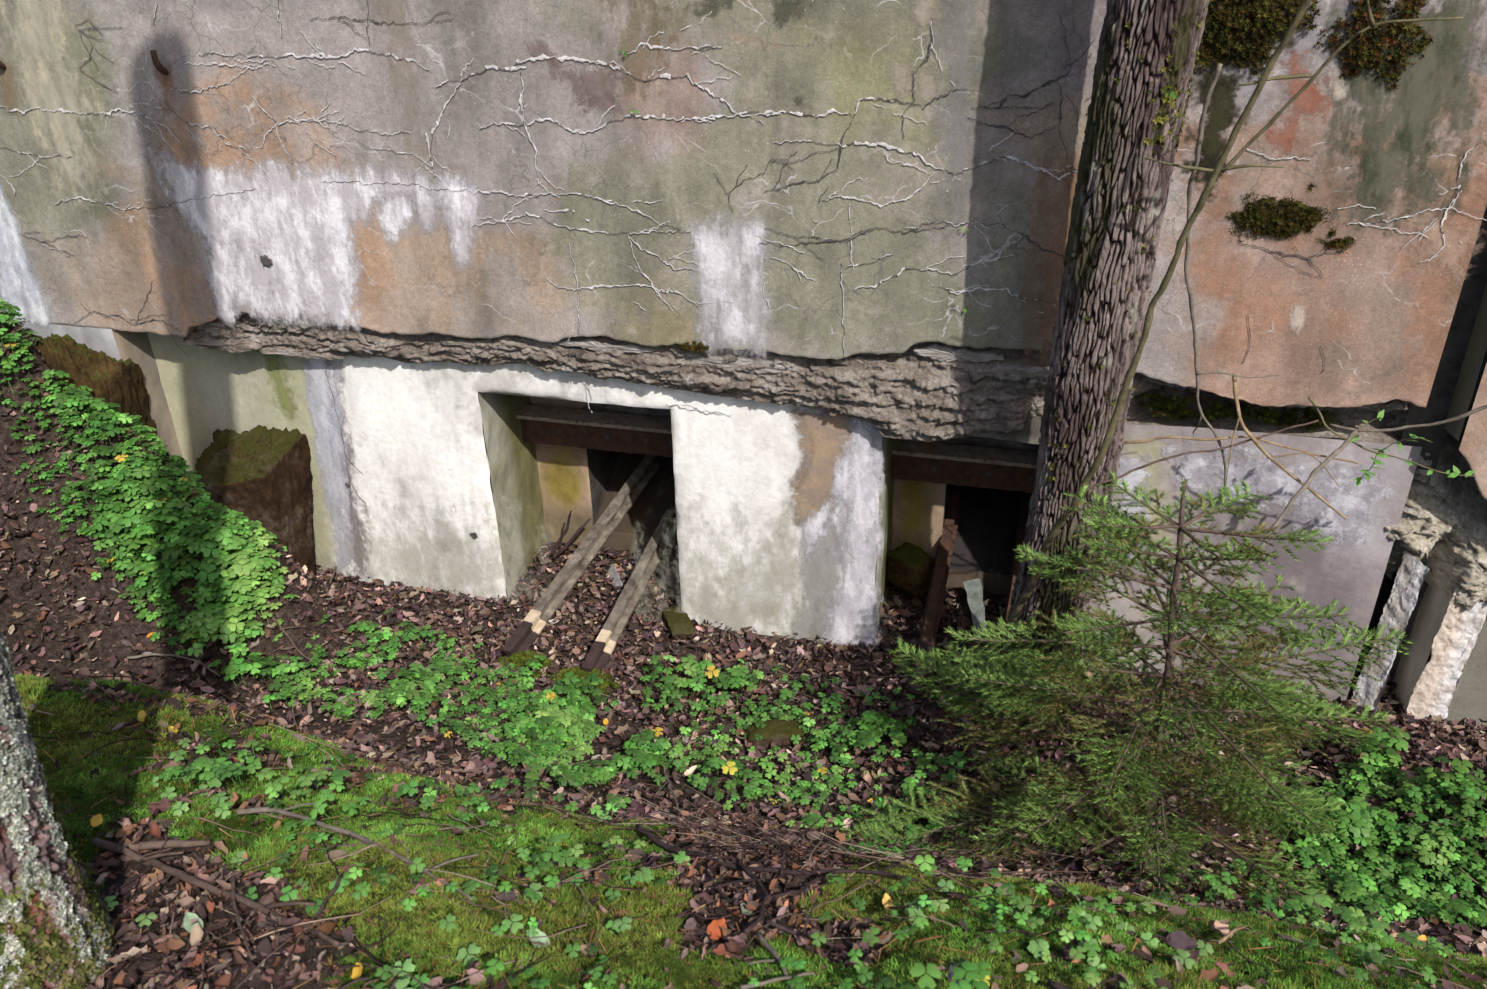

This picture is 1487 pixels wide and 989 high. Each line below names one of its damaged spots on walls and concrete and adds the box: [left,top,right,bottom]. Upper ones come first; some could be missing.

damp [153,0,484,330]
crack [1,0,1095,413]
damp [688,215,772,357]
crack [1240,144,1487,279]
spalling [183,312,1050,526]
crack [666,404,731,416]
damp [792,418,884,648]
spalling [1126,373,1411,445]
spalling [1384,390,1487,611]